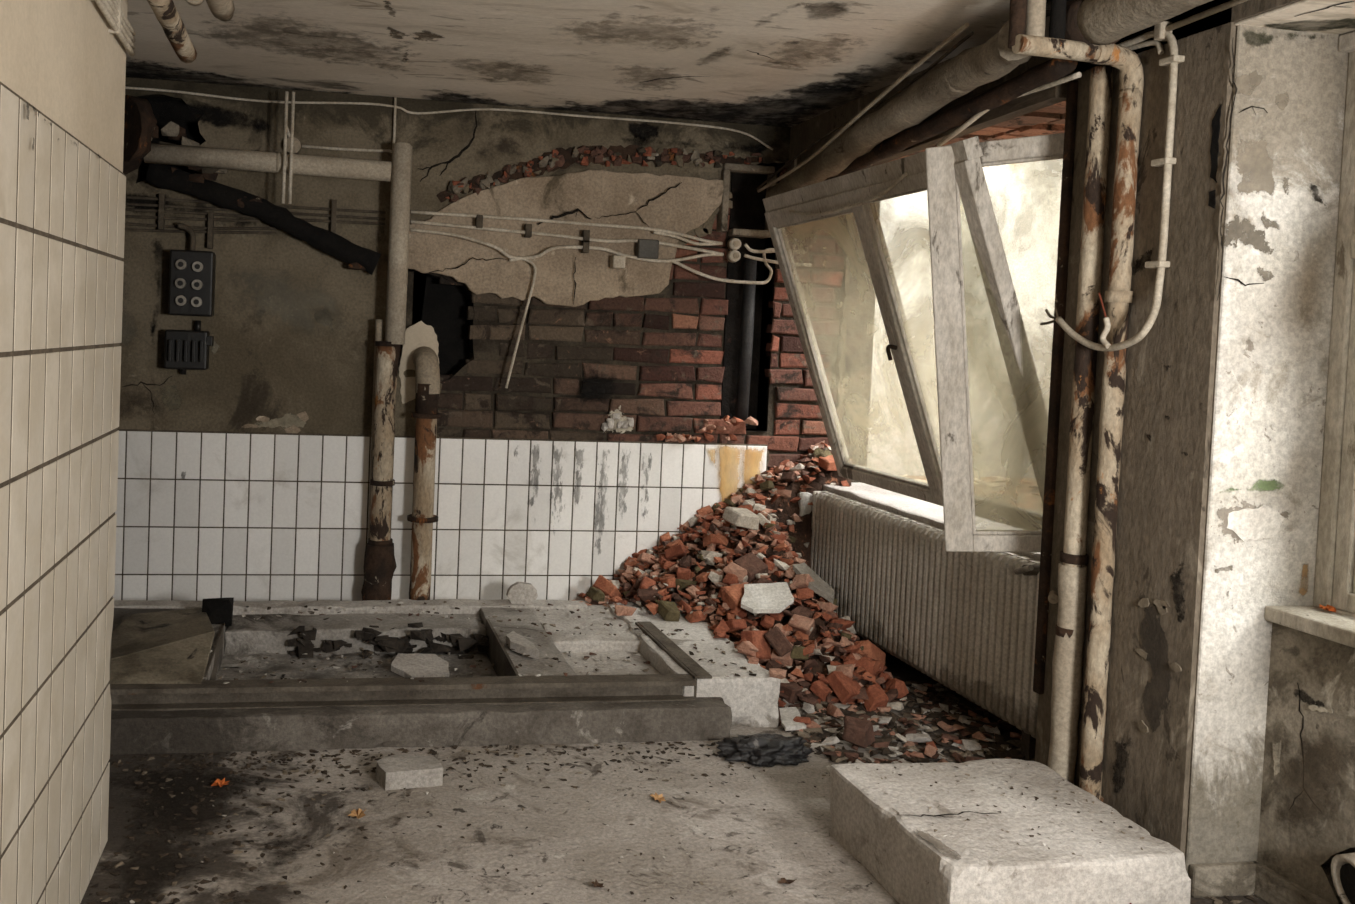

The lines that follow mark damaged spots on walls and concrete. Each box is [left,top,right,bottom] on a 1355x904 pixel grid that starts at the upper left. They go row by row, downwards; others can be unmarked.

water stain [806,3,847,18]
water stain [211,23,405,71]
spalling [138,94,205,146]
crack [417,111,477,182]
peeling [1208,104,1279,281]
flaking render [398,145,909,712]
water stain [529,446,583,508]
water stain [594,453,652,551]
peeling [1135,563,1185,734]
peeling [1112,740,1128,793]
spalling [1321,848,1355,904]